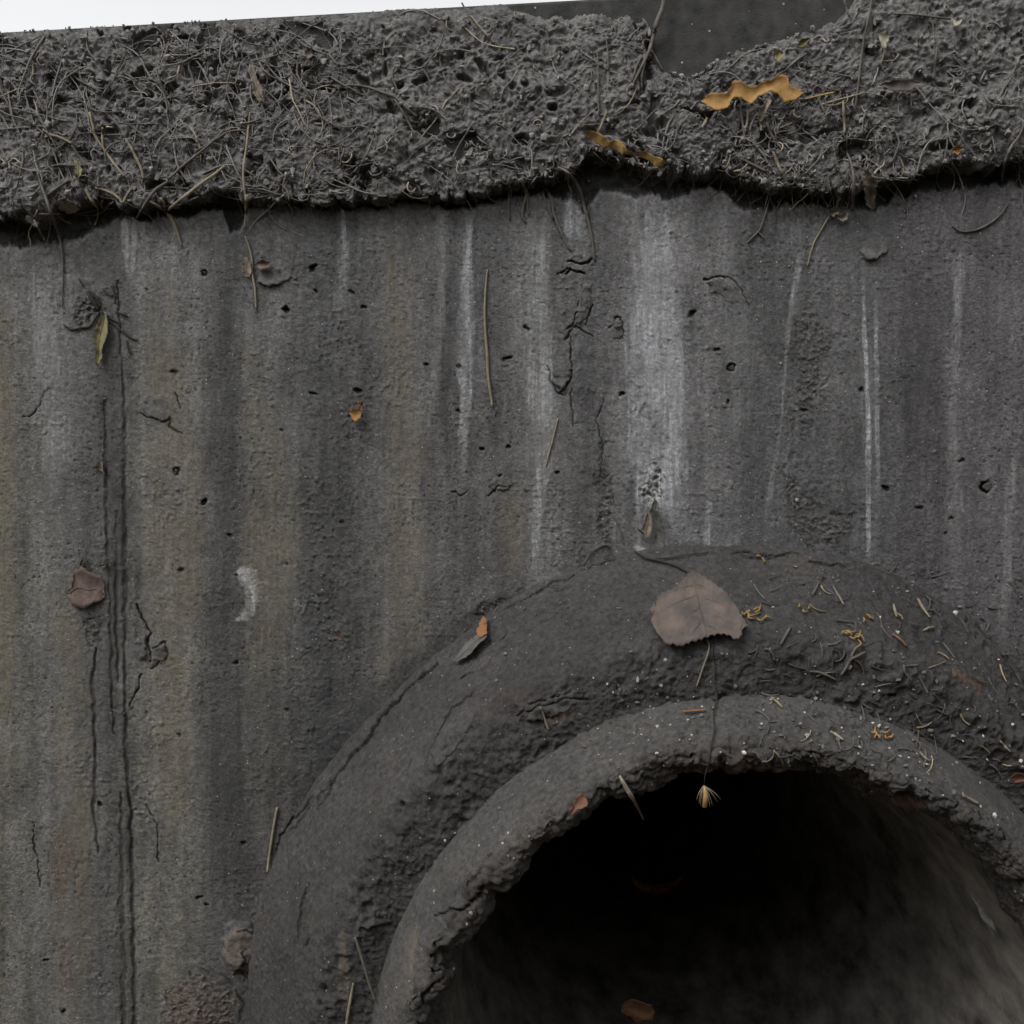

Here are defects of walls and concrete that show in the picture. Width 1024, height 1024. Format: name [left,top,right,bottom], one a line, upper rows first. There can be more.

crack [560,258,592,274]
leakage [527,244,553,430]
crack [548,304,622,475]
leakage [625,288,683,506]
leakage [863,325,876,464]
leakage [533,442,553,540]
crack [329,663,437,785]
crack [426,672,472,762]